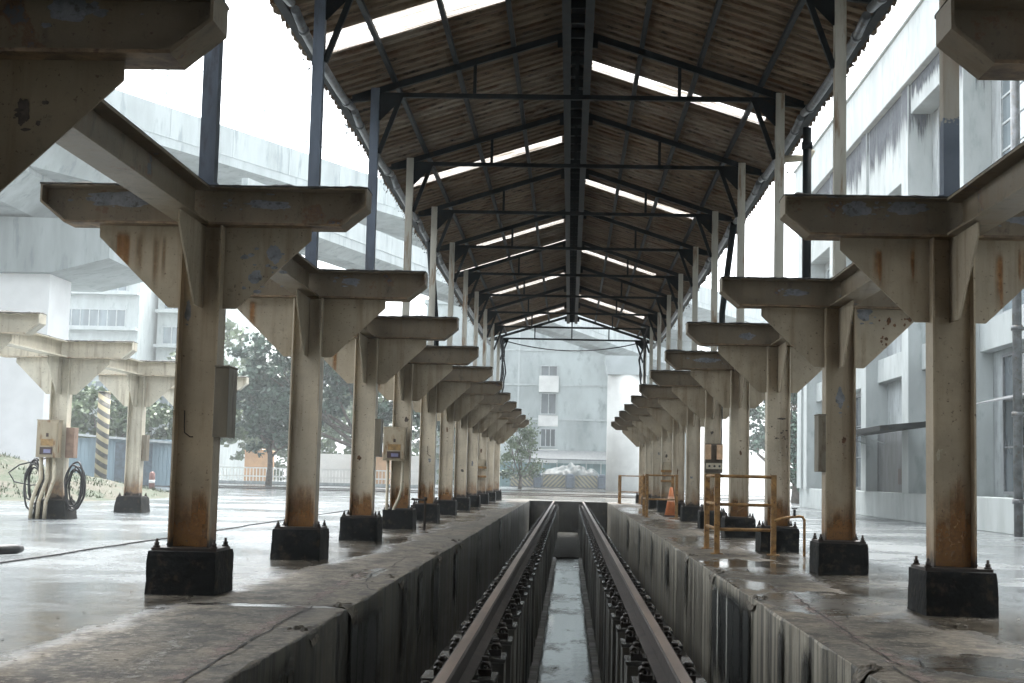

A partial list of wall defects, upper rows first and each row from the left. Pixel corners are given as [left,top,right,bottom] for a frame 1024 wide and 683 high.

leakage [846,52,939,193]
rust [173,501,208,547]
rust [288,499,314,527]
rust [351,500,371,516]
rust [827,516,852,540]
rust [936,490,971,567]
crack [180,602,315,683]